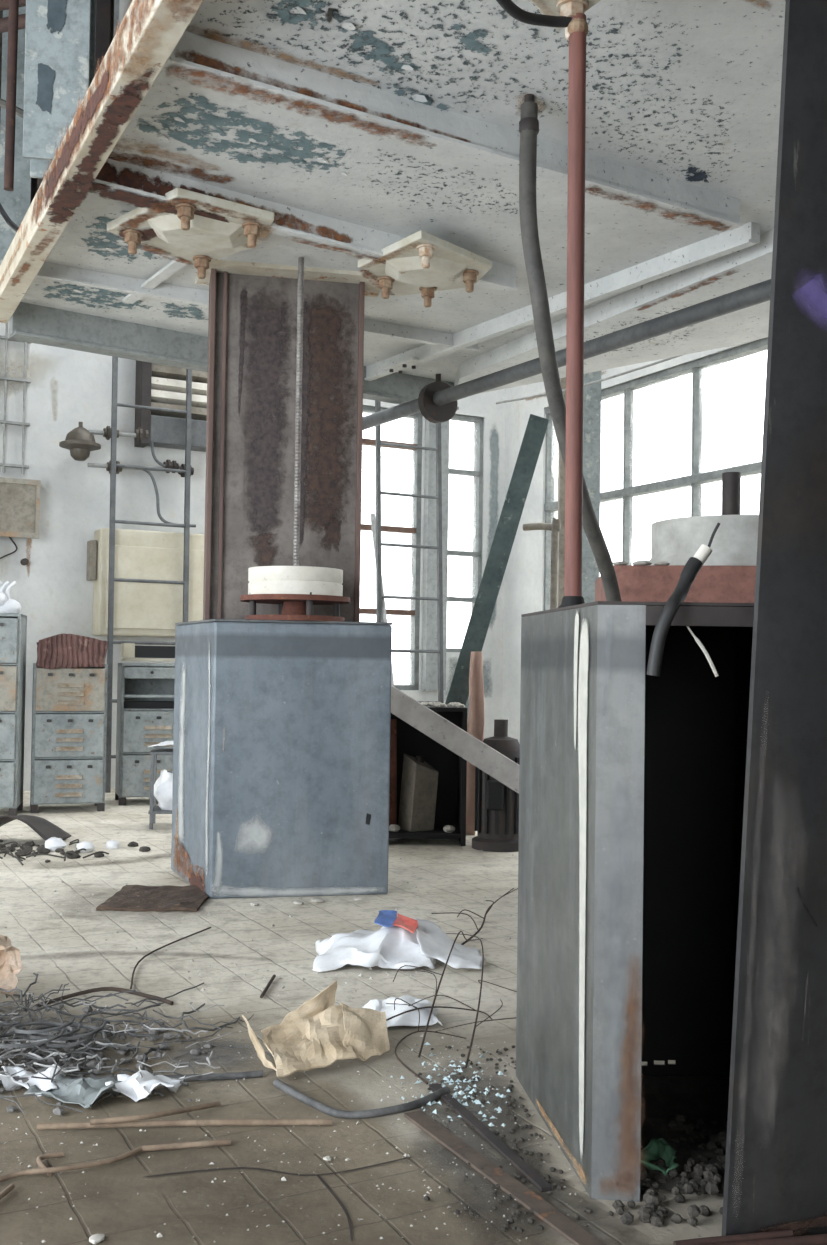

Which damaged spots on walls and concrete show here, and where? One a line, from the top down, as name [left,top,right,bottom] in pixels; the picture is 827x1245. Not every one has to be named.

peeling [200,0,569,118]
corrosion [0,0,470,295]
peeling [137,87,352,176]
peeling [368,150,518,215]
peeling [76,211,160,264]